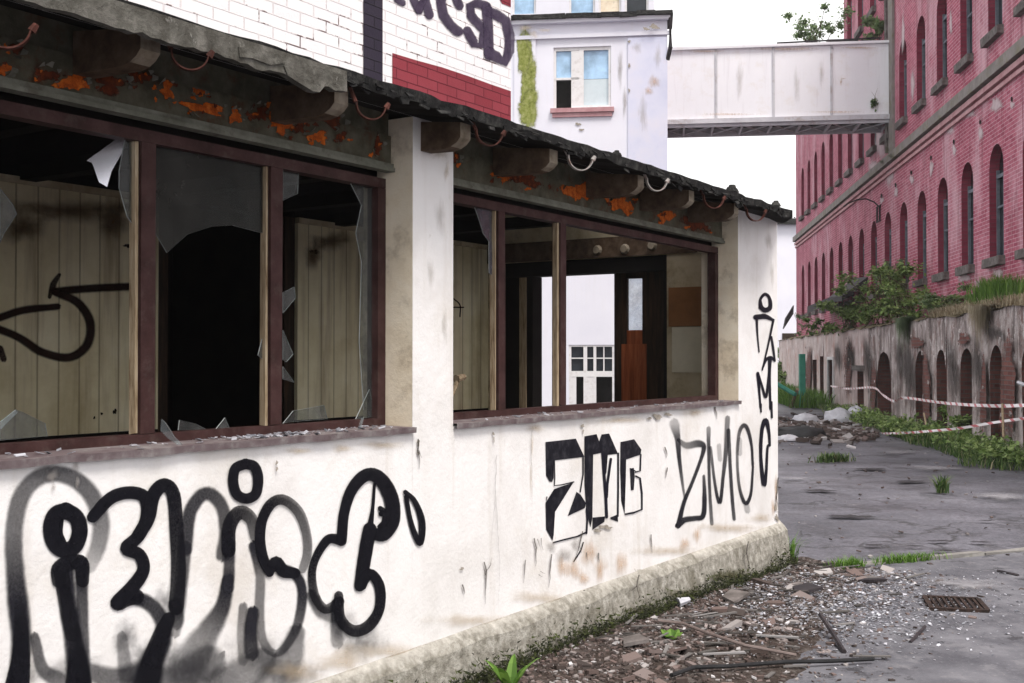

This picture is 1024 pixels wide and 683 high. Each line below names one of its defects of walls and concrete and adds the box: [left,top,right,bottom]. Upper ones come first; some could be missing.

corrosion [34,61,353,145]
corrosion [490,172,590,201]
corrosion [604,197,638,217]
corrosion [657,211,713,234]
water stain [835,340,871,380]
water stain [896,339,916,401]
peeling [978,328,1016,440]